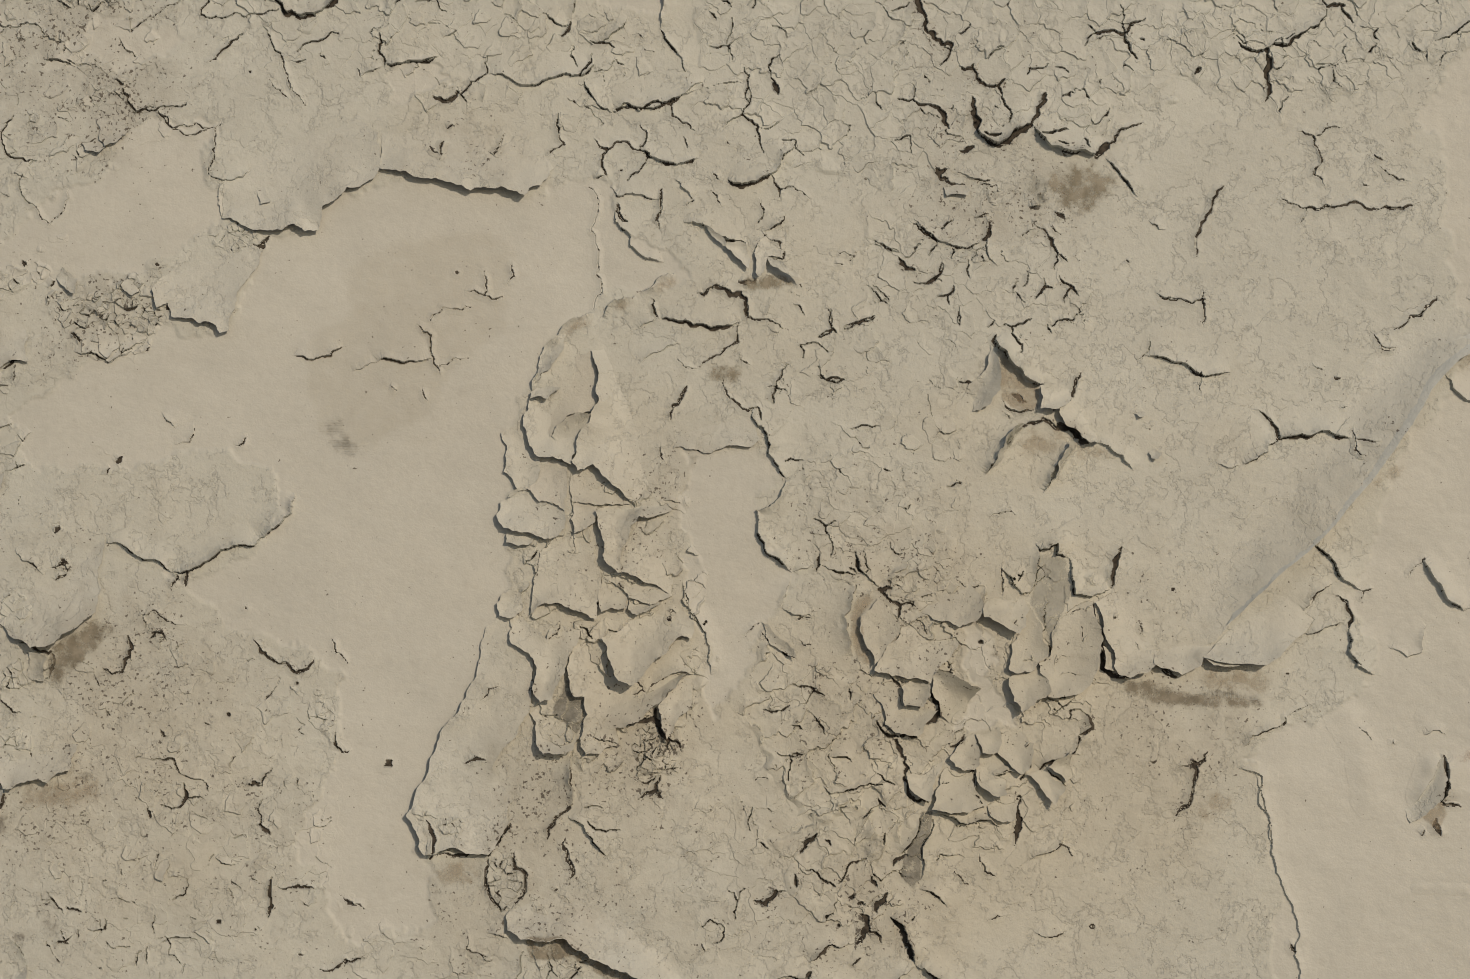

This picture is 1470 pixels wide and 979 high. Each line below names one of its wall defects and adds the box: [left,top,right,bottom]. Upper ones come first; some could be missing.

crack [0,0,656,250]
peeling [0,0,812,364]
peeling [0,327,32,489]
peeling [0,486,295,811]
peeling [406,273,1470,979]
crack [514,0,1470,970]